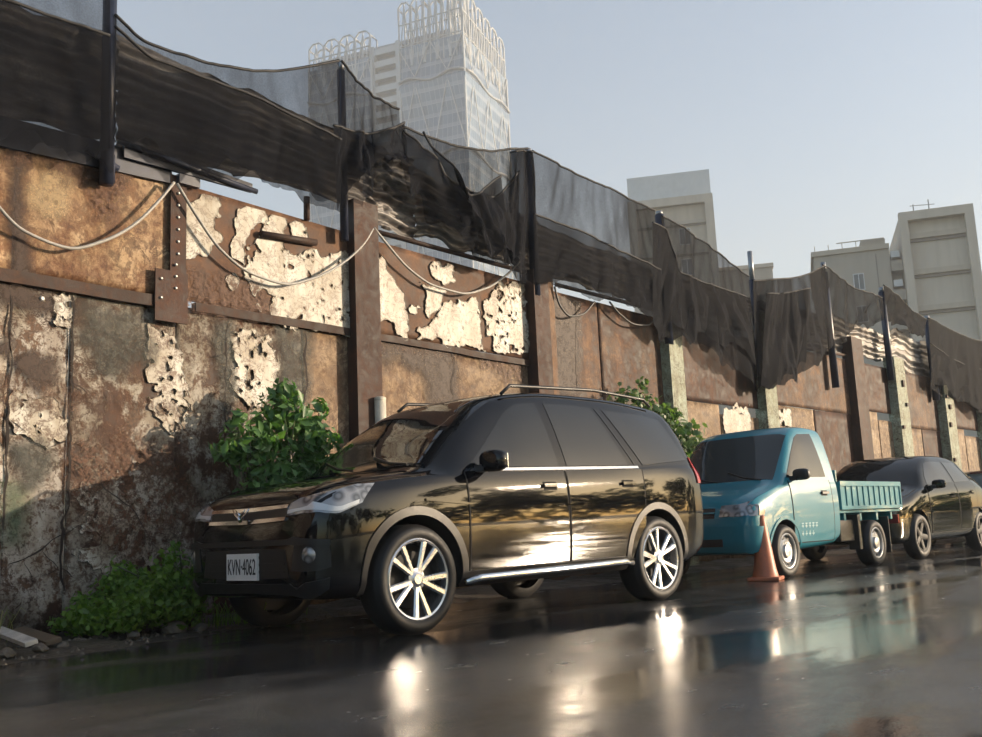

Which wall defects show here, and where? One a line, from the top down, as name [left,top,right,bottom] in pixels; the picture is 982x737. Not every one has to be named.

crack [0,294,30,529]
rust [2,149,36,273]
rust [0,282,56,313]
peeling [8,389,69,449]
crack [9,295,154,591]
rust [0,337,174,415]
peeling [144,323,191,435]
peeling [228,328,281,410]
peeling [186,194,350,337]
peeling [379,256,530,355]
rust [554,294,581,396]
rust [64,431,201,573]